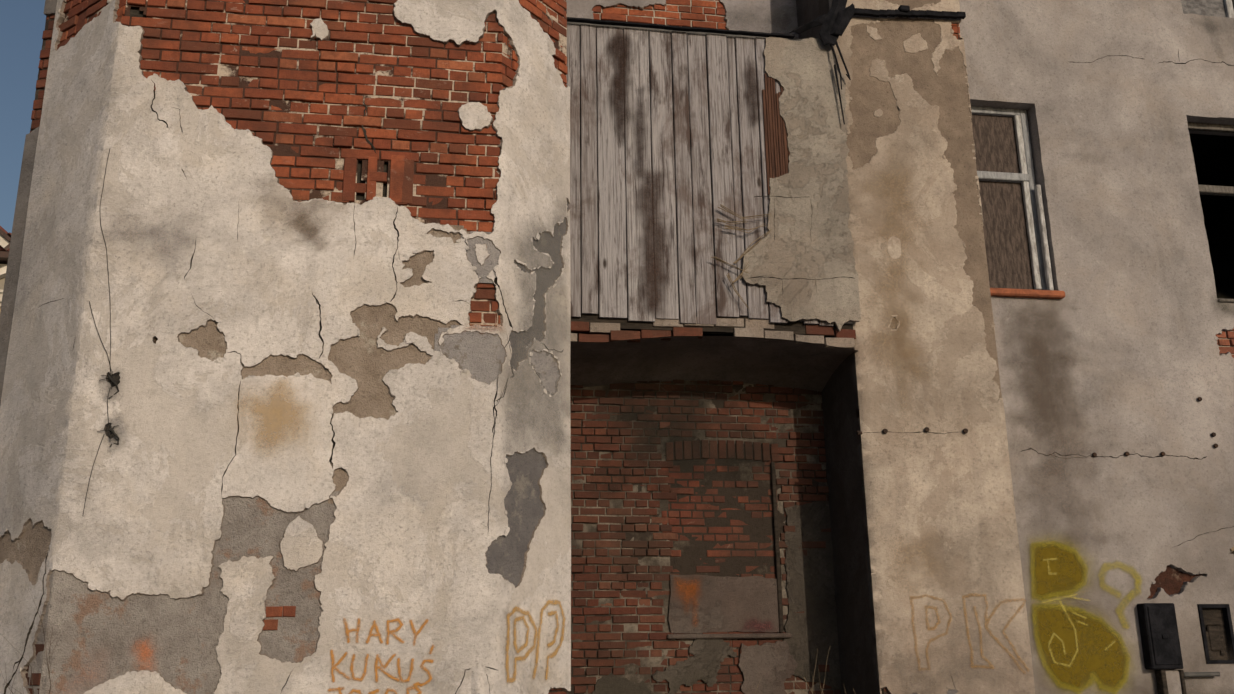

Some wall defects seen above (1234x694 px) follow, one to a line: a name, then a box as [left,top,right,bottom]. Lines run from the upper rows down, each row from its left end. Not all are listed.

damp [747,67,759,121]
crack [1076,49,1233,66]
flaking render [57,0,568,421]
damp [608,34,667,310]
flaking render [846,0,1002,400]
flaking render [1215,327,1234,358]
crack [4,554,48,694]
flaking render [0,463,349,694]
damp [254,385,298,442]
flaking render [486,448,547,587]
crack [1020,448,1206,460]
flaking render [1147,566,1203,599]